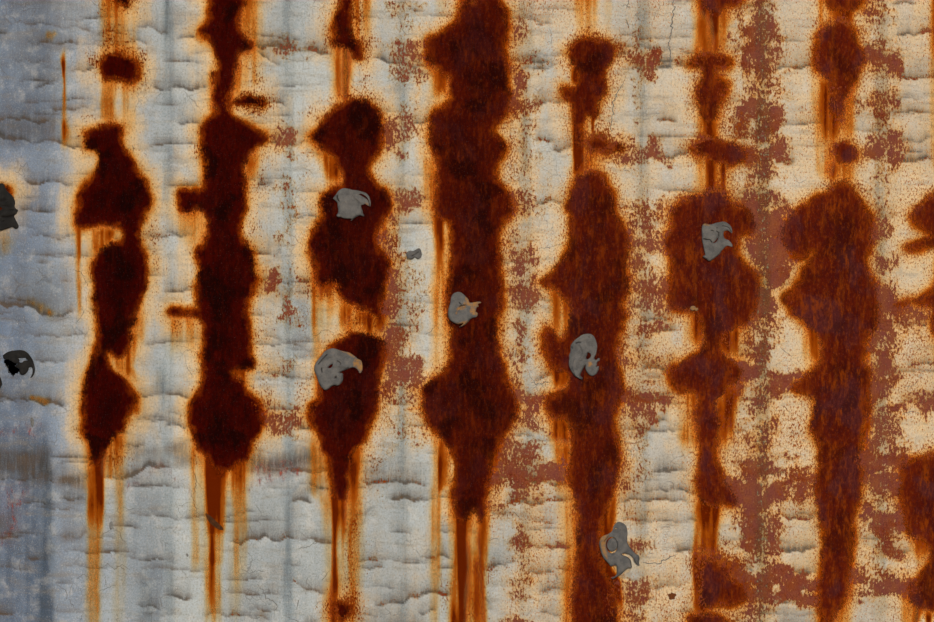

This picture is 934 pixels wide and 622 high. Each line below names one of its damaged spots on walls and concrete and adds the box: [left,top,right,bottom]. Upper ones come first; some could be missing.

corrosion [268,33,312,59]
corrosion [273,170,302,248]
corrosion [70,0,171,529]
corrosion [501,519,538,604]
corrosion [627,537,656,556]